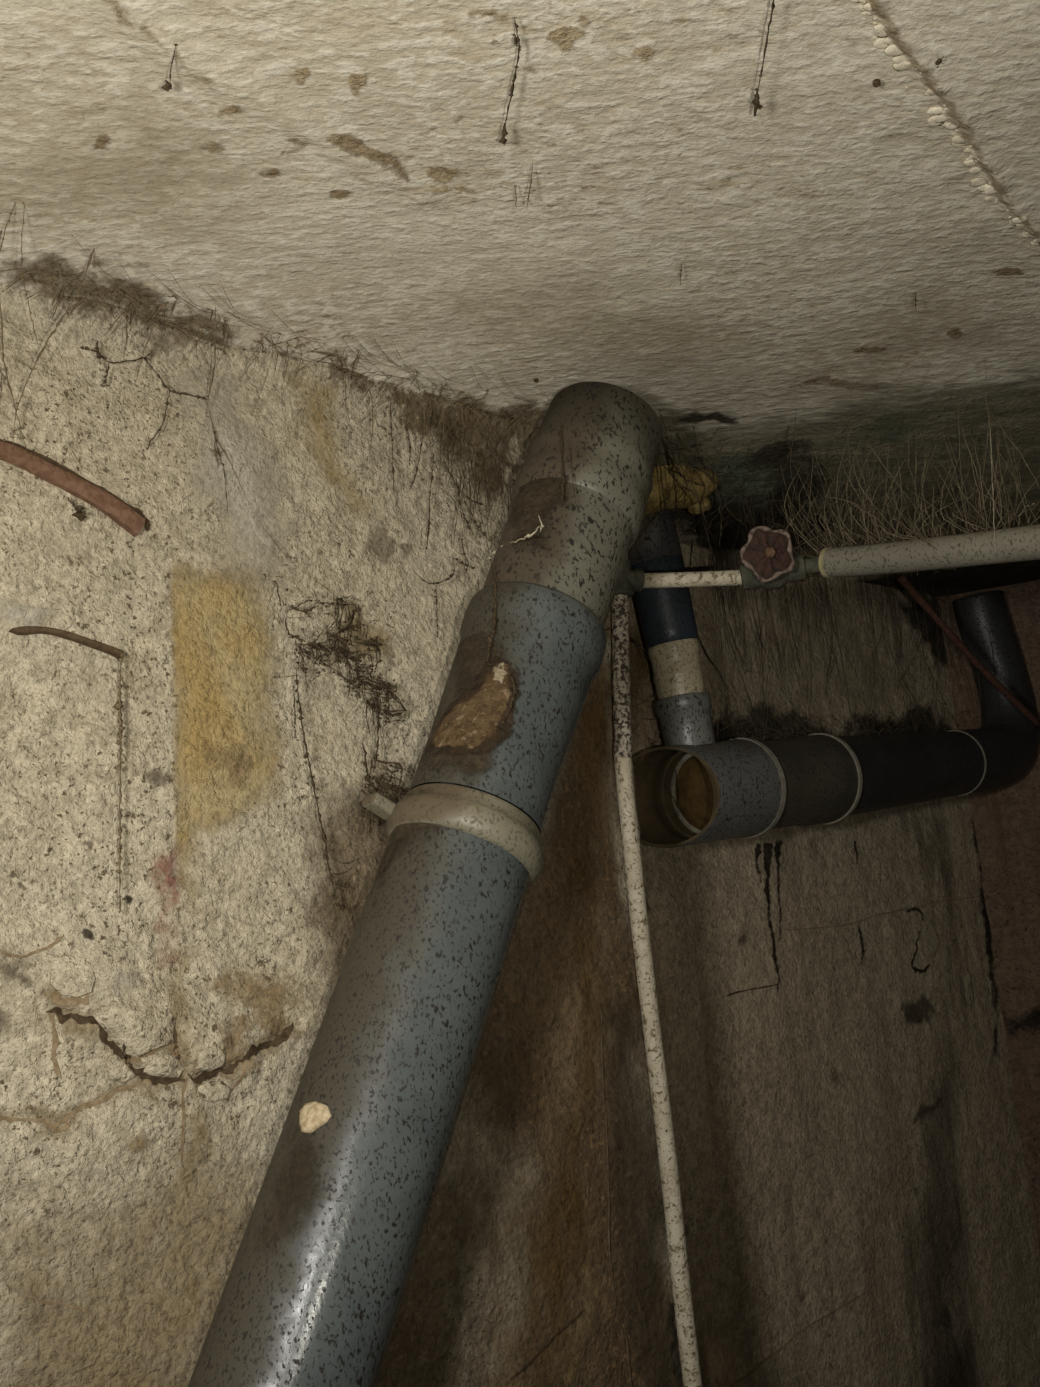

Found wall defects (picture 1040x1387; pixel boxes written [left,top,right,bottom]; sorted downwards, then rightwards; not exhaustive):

water stain [3,257,234,355]
water stain [330,359,370,392]
corrosion [0,440,146,537]
water stain [388,383,547,500]
water stain [147,572,276,903]
water stain [755,840,782,990]
crack [0,992,293,1162]